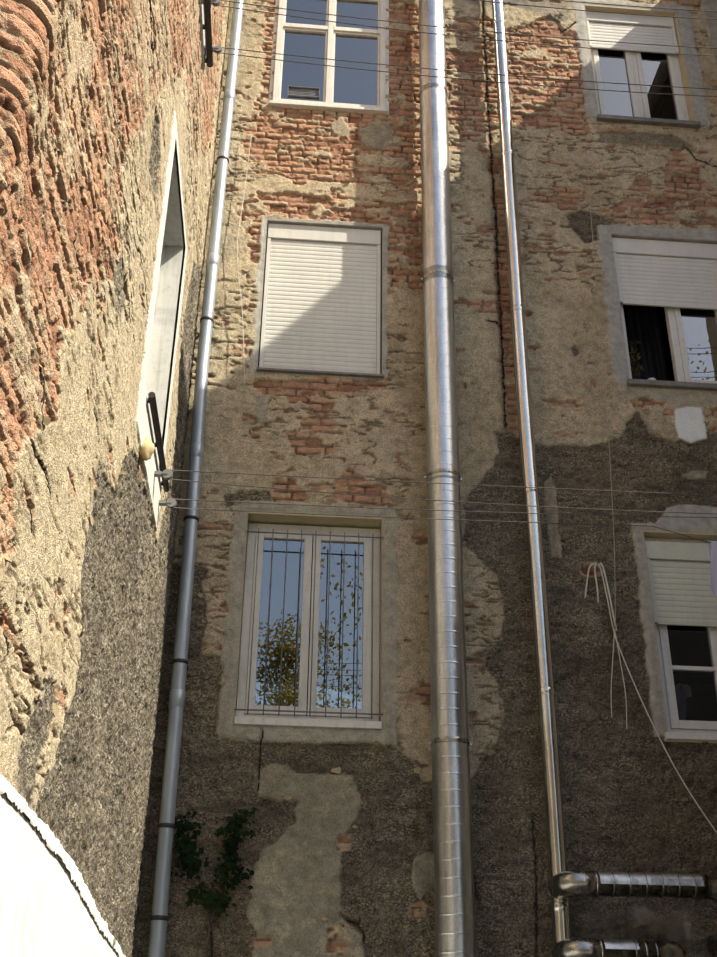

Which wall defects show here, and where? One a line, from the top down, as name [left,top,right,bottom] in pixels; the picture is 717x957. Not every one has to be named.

flaking render [16,261,205,957]
flaking render [0,0,226,571]
crack [147,0,155,54]
crack [257,730,265,792]
flaking render [165,564,436,957]
flaking render [222,376,396,509]
flaking render [237,0,423,295]
crack [482,0,507,427]
flaking render [445,16,553,957]
flaking render [505,13,717,244]
flaking render [535,395,717,876]